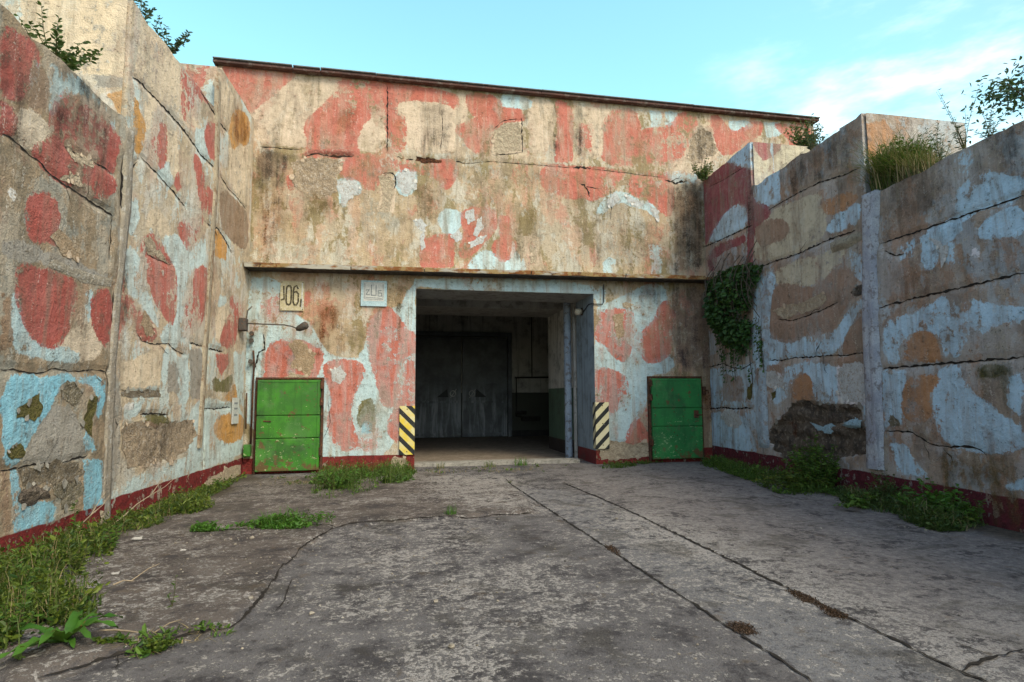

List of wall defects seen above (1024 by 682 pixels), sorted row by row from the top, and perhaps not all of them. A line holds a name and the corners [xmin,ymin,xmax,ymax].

spalling [491,122,522,155]
crack [440,118,742,219]
peeling [17,393,43,422]
peeling [61,380,100,436]
spalling [766,361,866,460]
spalling [121,418,197,469]
crack [889,430,985,464]
spalling [7,443,85,513]